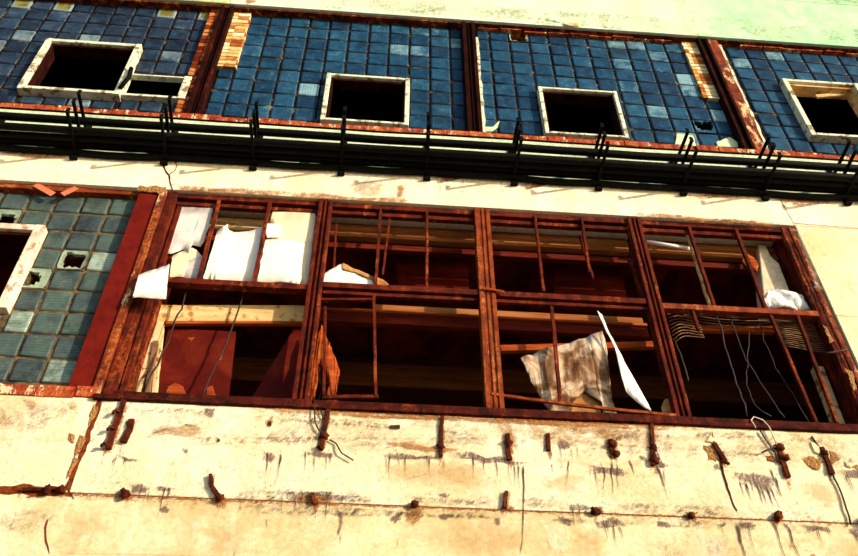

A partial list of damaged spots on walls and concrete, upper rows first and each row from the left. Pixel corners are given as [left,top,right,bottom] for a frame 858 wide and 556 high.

damp [131,484,175,514]
damp [268,421,336,471]
damp [281,491,361,541]
damp [385,453,440,477]
rust [266,408,682,474]
damp [444,434,527,482]
damp [490,422,583,476]
damp [559,503,625,544]
damp [588,429,678,495]
damp [718,522,755,556]
damp [735,459,783,506]